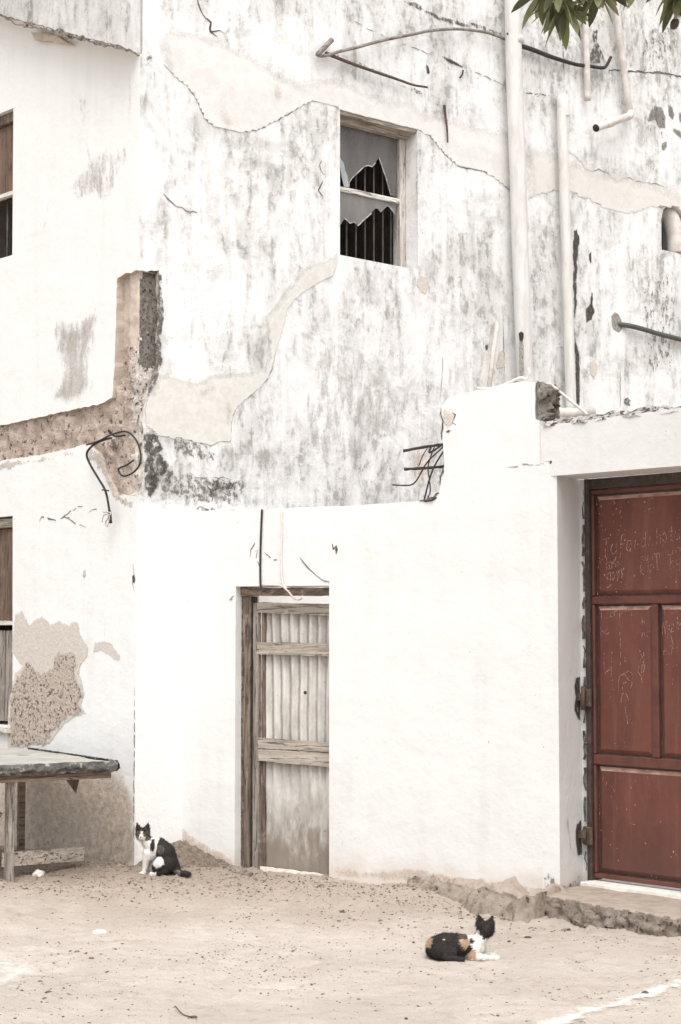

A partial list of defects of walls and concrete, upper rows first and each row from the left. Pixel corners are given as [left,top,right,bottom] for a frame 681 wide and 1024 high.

crack [197,0,225,36]
leakage [573,230,595,323]
leakage [644,277,675,371]
spalling [0,271,158,507]
spalling [440,410,453,440]
leakage [143,434,244,511]
peeling [8,611,120,748]